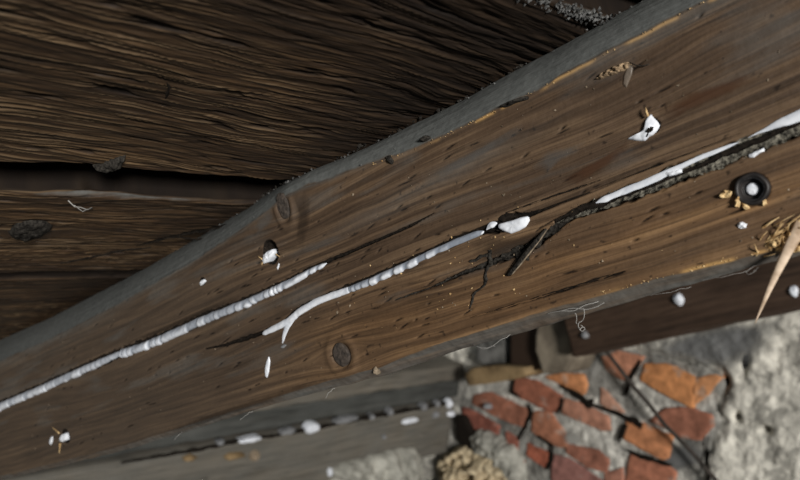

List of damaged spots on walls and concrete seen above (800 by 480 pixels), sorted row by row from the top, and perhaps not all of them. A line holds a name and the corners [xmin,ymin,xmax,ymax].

crack [205,122,800,349]